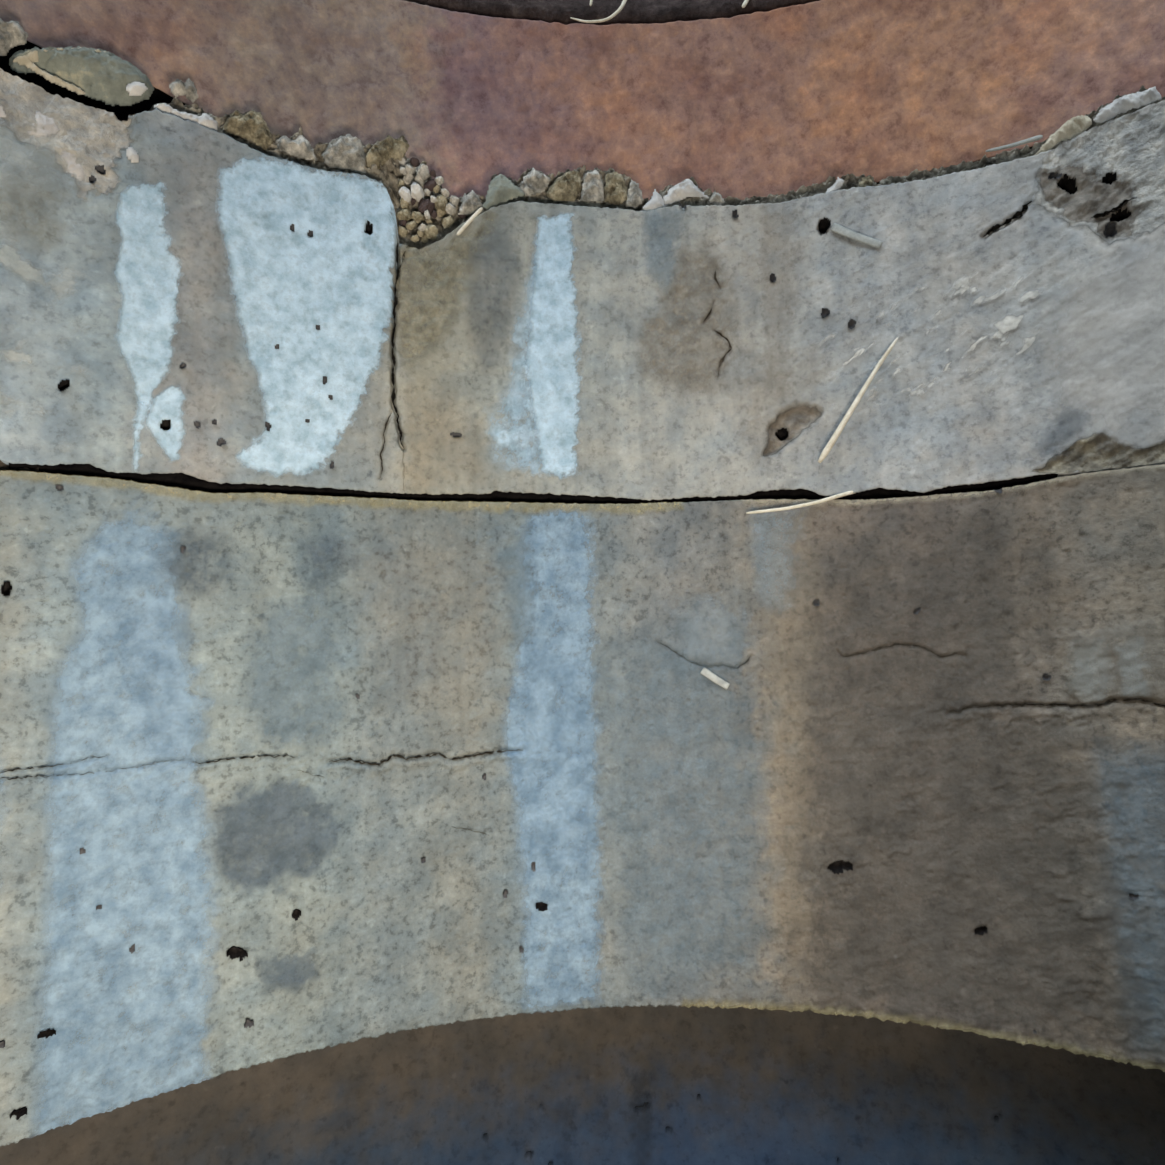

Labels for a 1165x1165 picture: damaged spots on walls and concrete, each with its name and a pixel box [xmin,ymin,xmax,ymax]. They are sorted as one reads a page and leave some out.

spalling [0,68,134,197]
efflorescence [115,182,184,469]
efflorescence [218,158,397,476]
crack [9,245,1058,504]
efflorescence [491,214,581,479]
spalling [149,85,1165,358]
spalling [1033,433,1165,474]
damp [39,520,210,1134]
crack [0,749,523,780]
efflorescence [506,509,599,1007]
crack [839,644,963,657]
crack [949,698,1165,713]